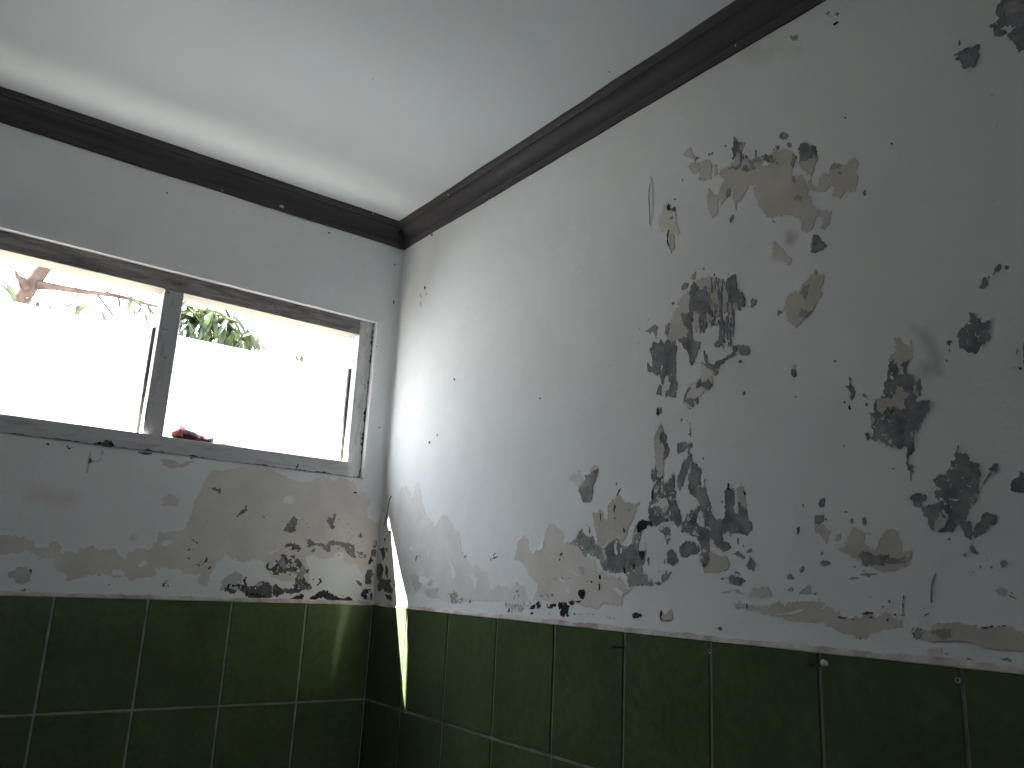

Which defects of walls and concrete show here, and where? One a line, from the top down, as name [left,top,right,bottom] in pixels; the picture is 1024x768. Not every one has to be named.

peeling [954,39,980,69]
peeling [990,0,1024,52]
peeling [682,132,866,265]
peeling [395,264,1024,662]
peeling [0,464,379,588]